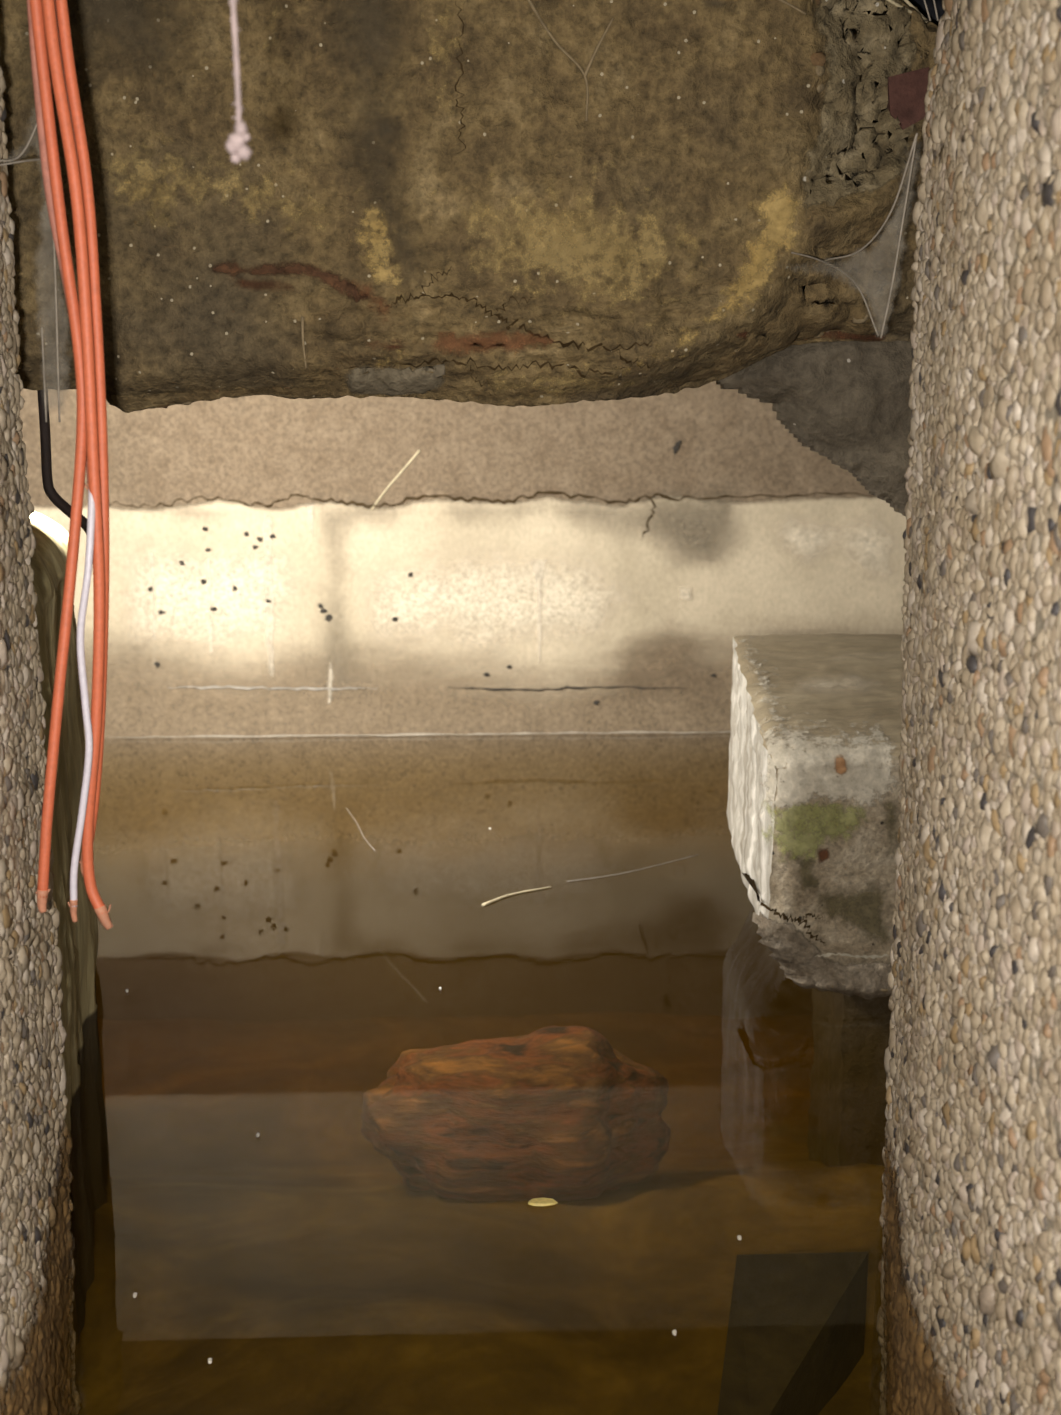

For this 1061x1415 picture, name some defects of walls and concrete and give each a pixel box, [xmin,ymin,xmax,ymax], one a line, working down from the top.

spalling [802,0,929,208]
rust [212,262,387,312]
rust [436,332,552,352]
damp [19,388,88,508]
damp [106,375,877,551]
damp [824,887,888,942]